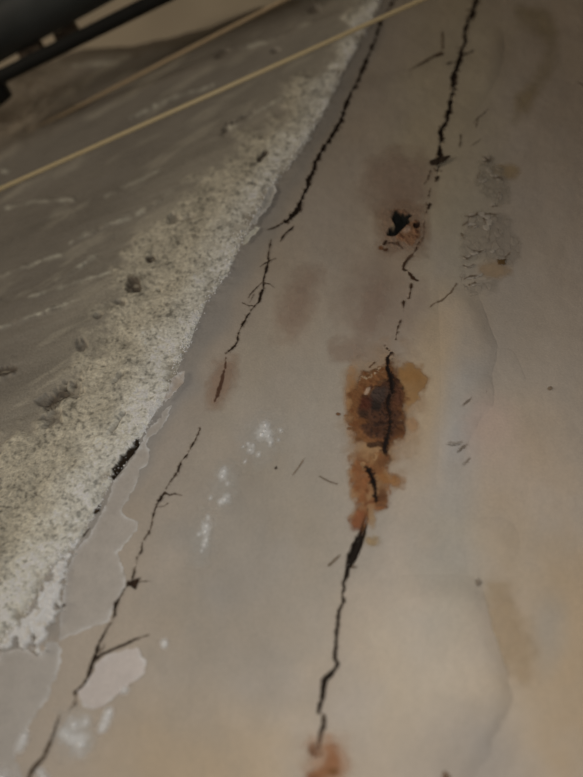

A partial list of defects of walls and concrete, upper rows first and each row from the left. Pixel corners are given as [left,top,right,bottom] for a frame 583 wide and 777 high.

crack [225,0,394,354]
crack [395,0,485,340]
peeling [0,371,185,777]
crack [28,428,201,777]
crack [316,509,368,748]
rust [336,345,428,529]